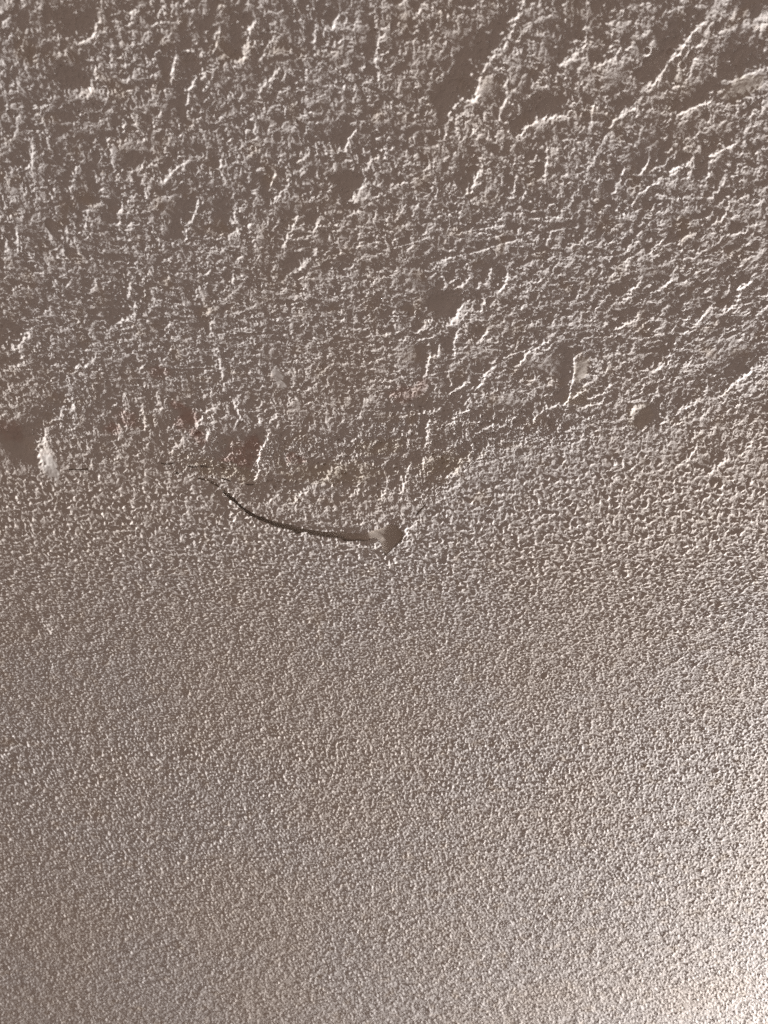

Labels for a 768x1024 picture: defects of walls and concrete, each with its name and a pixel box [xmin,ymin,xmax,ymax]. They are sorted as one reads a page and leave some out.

crack [161,462,426,562]